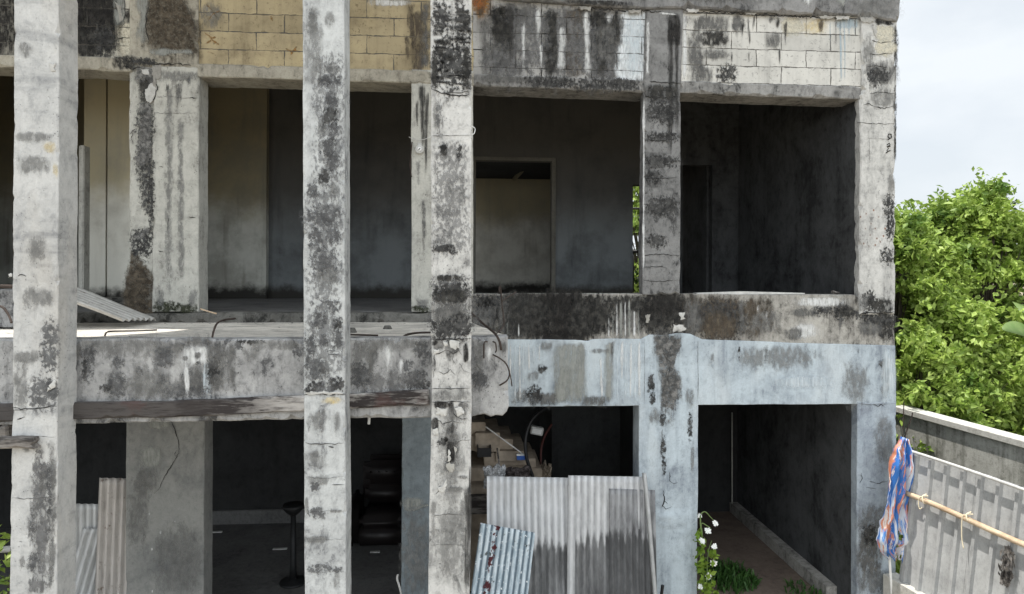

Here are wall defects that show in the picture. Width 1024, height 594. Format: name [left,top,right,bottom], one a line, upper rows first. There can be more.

damp [767,17,787,62]
damp [133,72,194,270]
damp [288,10,342,282]
damp [478,0,755,218]
mould [645,233,667,250]
damp [76,274,897,406]
spalling [431,402,470,494]